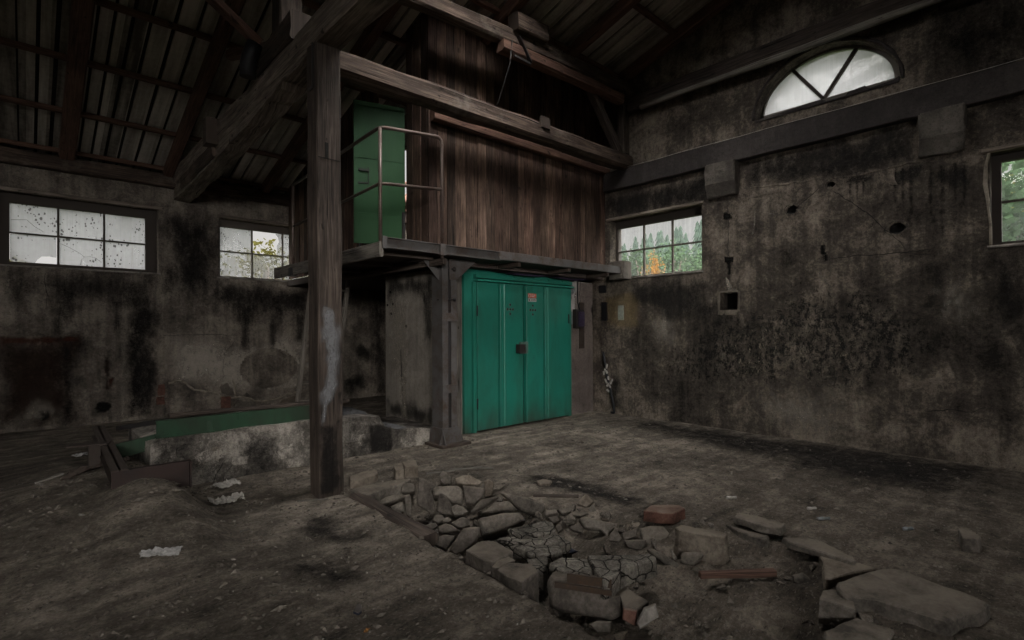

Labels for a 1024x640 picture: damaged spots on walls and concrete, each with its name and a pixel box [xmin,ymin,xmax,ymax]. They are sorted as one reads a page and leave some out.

damp [751,125,966,228]
spalling [882,220,911,236]
damp [8,277,157,416]
damp [177,285,306,386]
damp [607,282,943,390]
damp [636,422,997,491]
spalling [380,483,416,517]
spalling [425,471,525,555]
spalling [545,494,679,568]
spalling [589,621,612,633]
spalling [637,603,659,630]